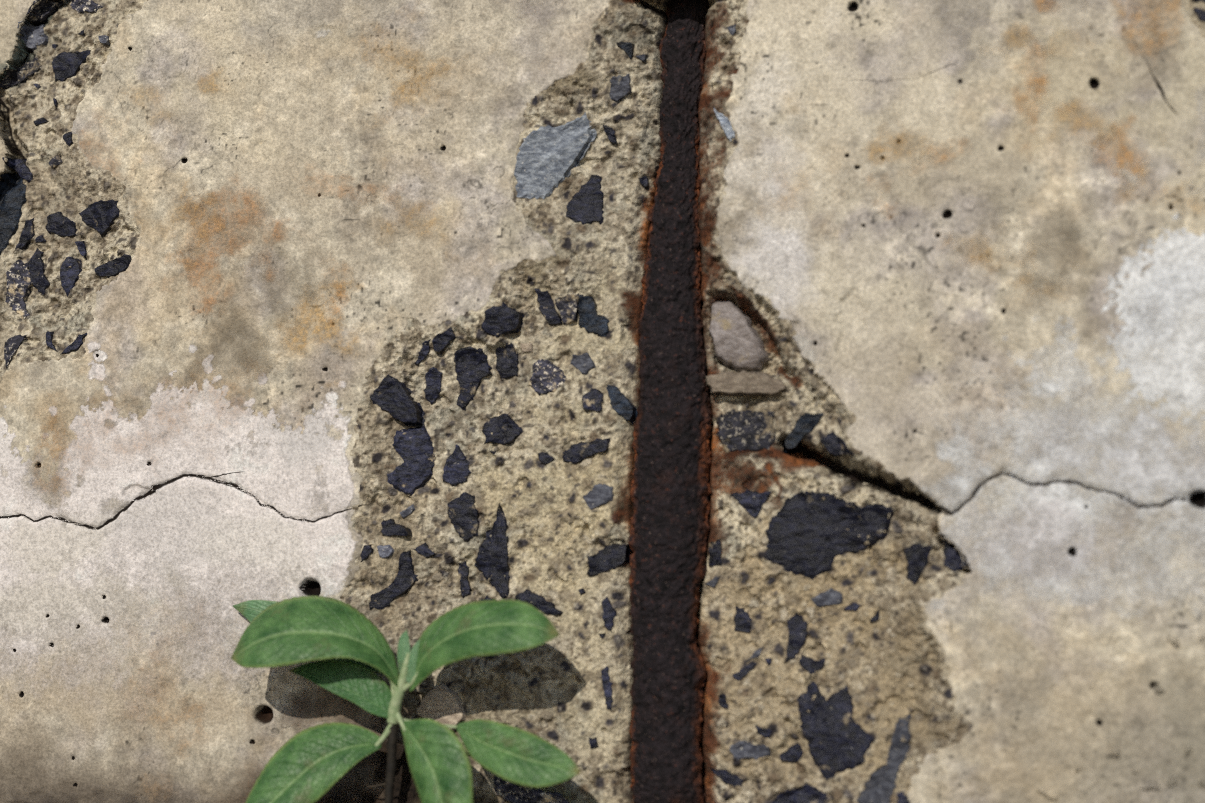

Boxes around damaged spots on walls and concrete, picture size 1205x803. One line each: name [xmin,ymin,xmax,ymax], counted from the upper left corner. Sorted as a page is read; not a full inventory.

crack [0,0,61,163]
crack [639,0,668,20]
spalling [1183,0,1205,38]
corrosion [698,5,776,352]
spalling [0,0,671,803]
spalling [697,0,974,803]
water stain [938,213,1205,599]
crack [0,472,362,530]
corrosion [613,455,635,525]
corrosion [706,431,821,551]
crack [797,443,1205,571]
corrosion [696,626,720,803]